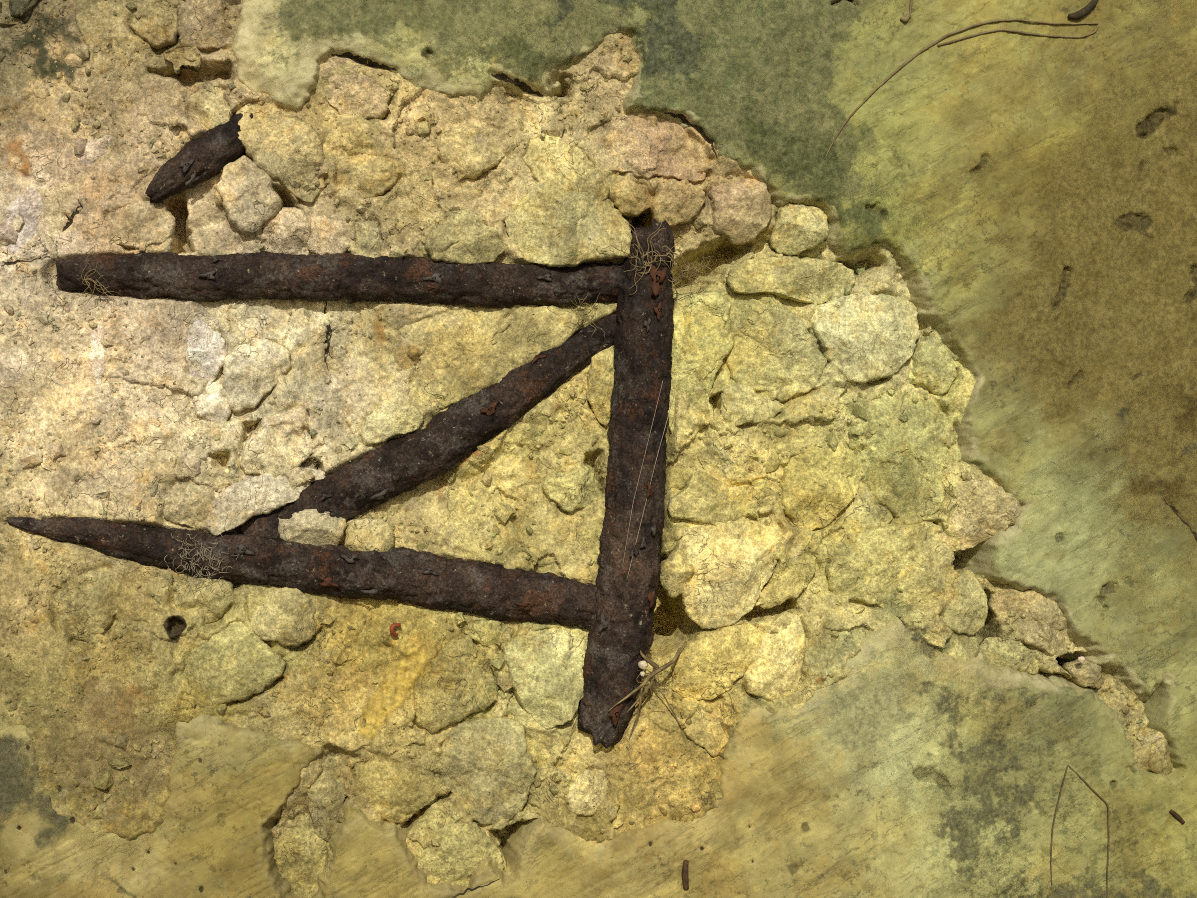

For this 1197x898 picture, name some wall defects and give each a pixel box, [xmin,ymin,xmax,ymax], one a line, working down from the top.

rust [9,0,39,23]
peeling [164,44,201,76]
rust [145,113,253,203]
rust [7,219,675,748]
spalling [278,344,615,585]
spalling [890,457,1021,557]
spalling [472,639,513,696]
spalling [495,621,590,730]
spalling [640,583,713,684]
spalling [975,574,1088,656]
spalling [971,608,1173,775]
spalling [397,681,725,886]